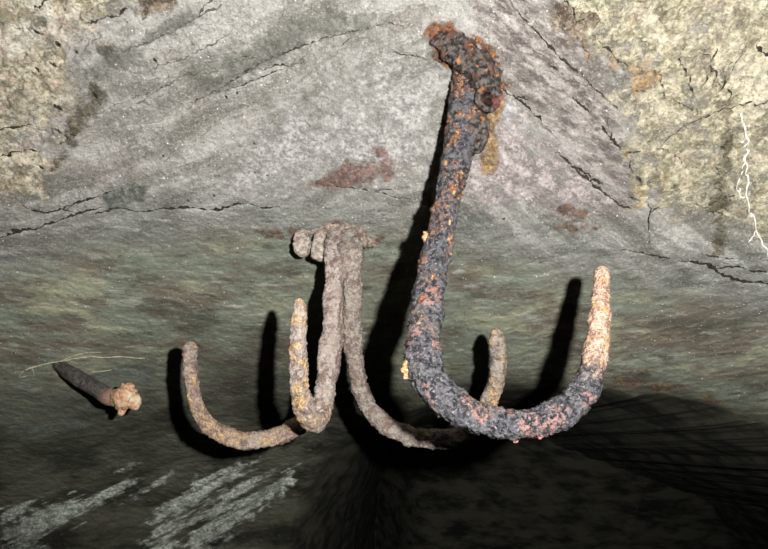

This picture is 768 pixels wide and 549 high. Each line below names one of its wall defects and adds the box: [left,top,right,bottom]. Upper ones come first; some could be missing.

crack [123,0,403,104]
corrosion [424,22,460,67]
corrosion [471,37,501,67]
corrosion [480,79,512,174]
crack [501,0,768,285]
corrosion [309,147,394,189]
crack [0,191,280,238]